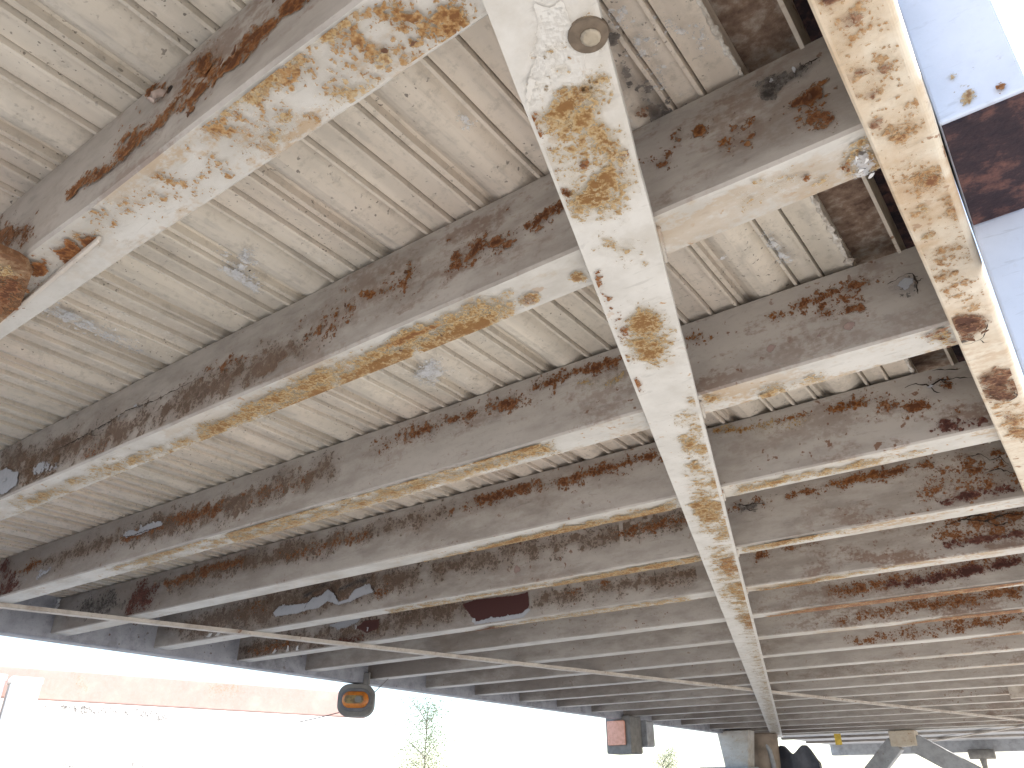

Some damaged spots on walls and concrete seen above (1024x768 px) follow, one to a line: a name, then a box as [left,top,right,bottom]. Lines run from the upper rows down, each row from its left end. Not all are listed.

corrosion [65,0,310,202]
corrosion [443,42,755,283]
corrosion [818,0,989,348]
peeling [0,467,18,494]
peeling [123,521,162,538]
corrosion [0,261,541,514]
peeling [273,577,375,617]
peeling [463,592,530,625]
corrosion [371,270,714,461]
corrosion [167,387,1024,736]
crack [888,273,923,298]
crack [905,368,967,393]